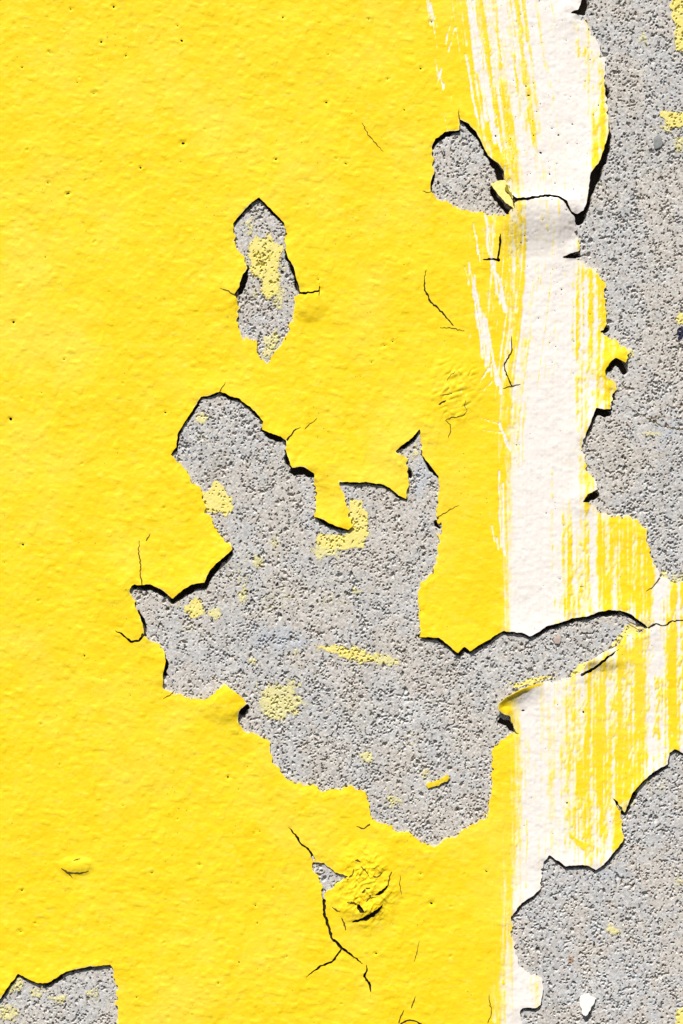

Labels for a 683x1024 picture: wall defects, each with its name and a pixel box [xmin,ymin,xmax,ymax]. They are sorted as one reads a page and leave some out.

peeling [421,110,515,222]
peeling [224,188,309,364]
peeling [553,0,683,583]
peeling [123,383,658,846]
peeling [0,956,120,1024]
crack [290,828,313,858]
crack [308,890,371,992]
peeling [502,740,683,1024]